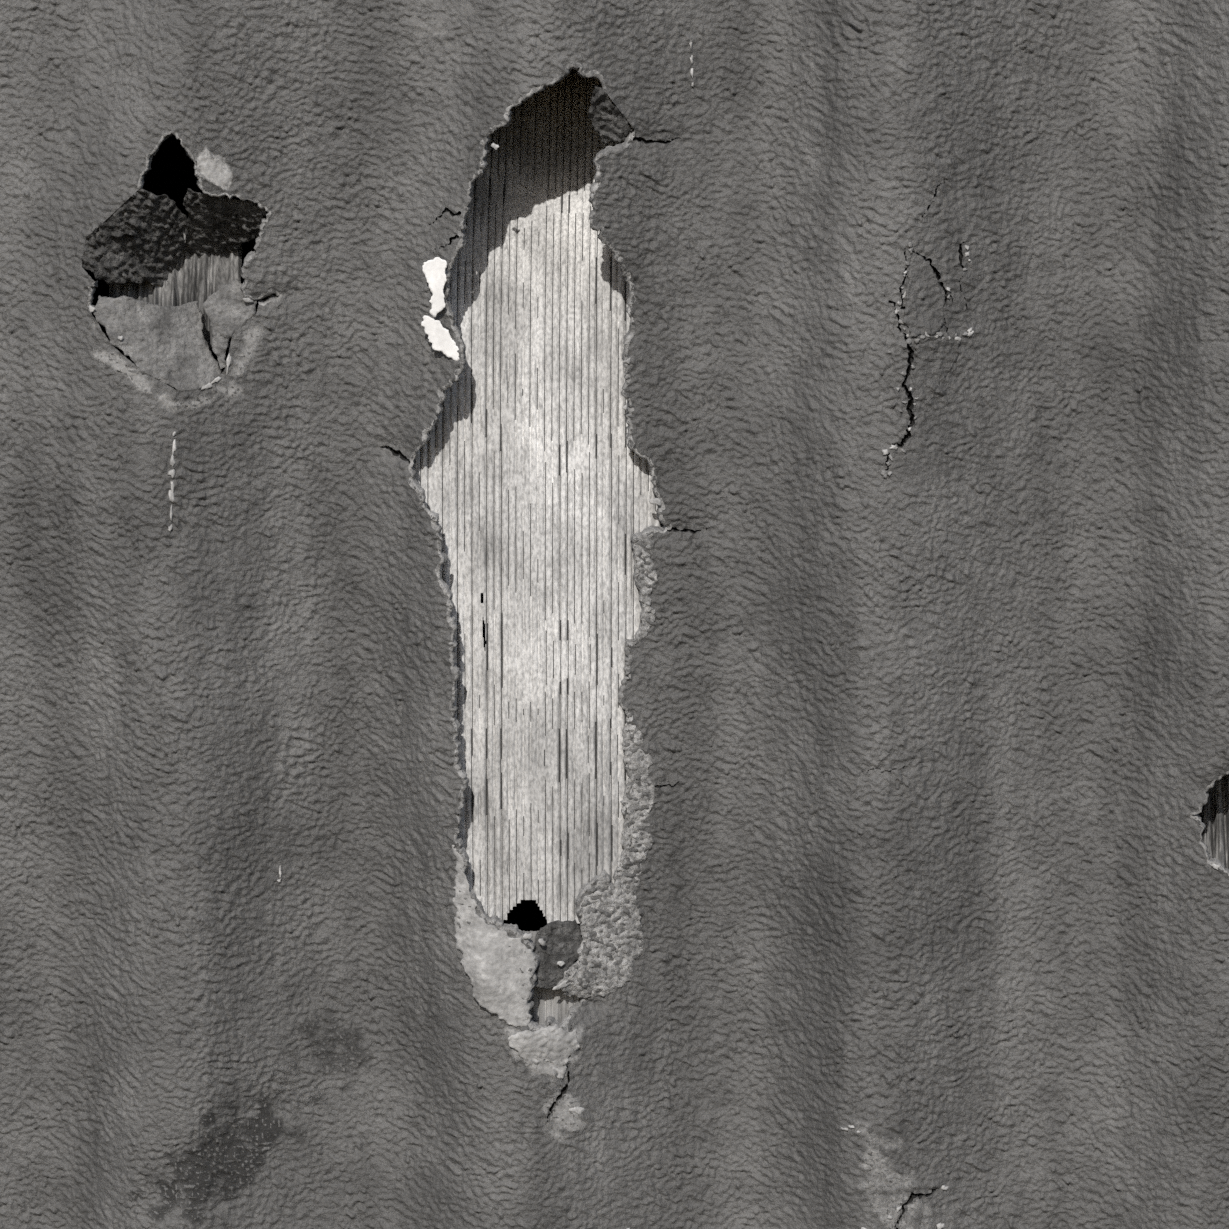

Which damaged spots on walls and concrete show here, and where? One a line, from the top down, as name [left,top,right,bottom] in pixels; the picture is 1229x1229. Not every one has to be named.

spalling [136,135,204,219]
spalling [82,267,176,390]
spalling [199,347,237,390]
spalling [241,237,276,313]
peeling [421,257,459,361]
crack [880,179,974,478]
spalling [629,534,658,647]
spalling [552,724,655,998]
spalling [452,845,580,1079]
crack [861,1185,949,1229]